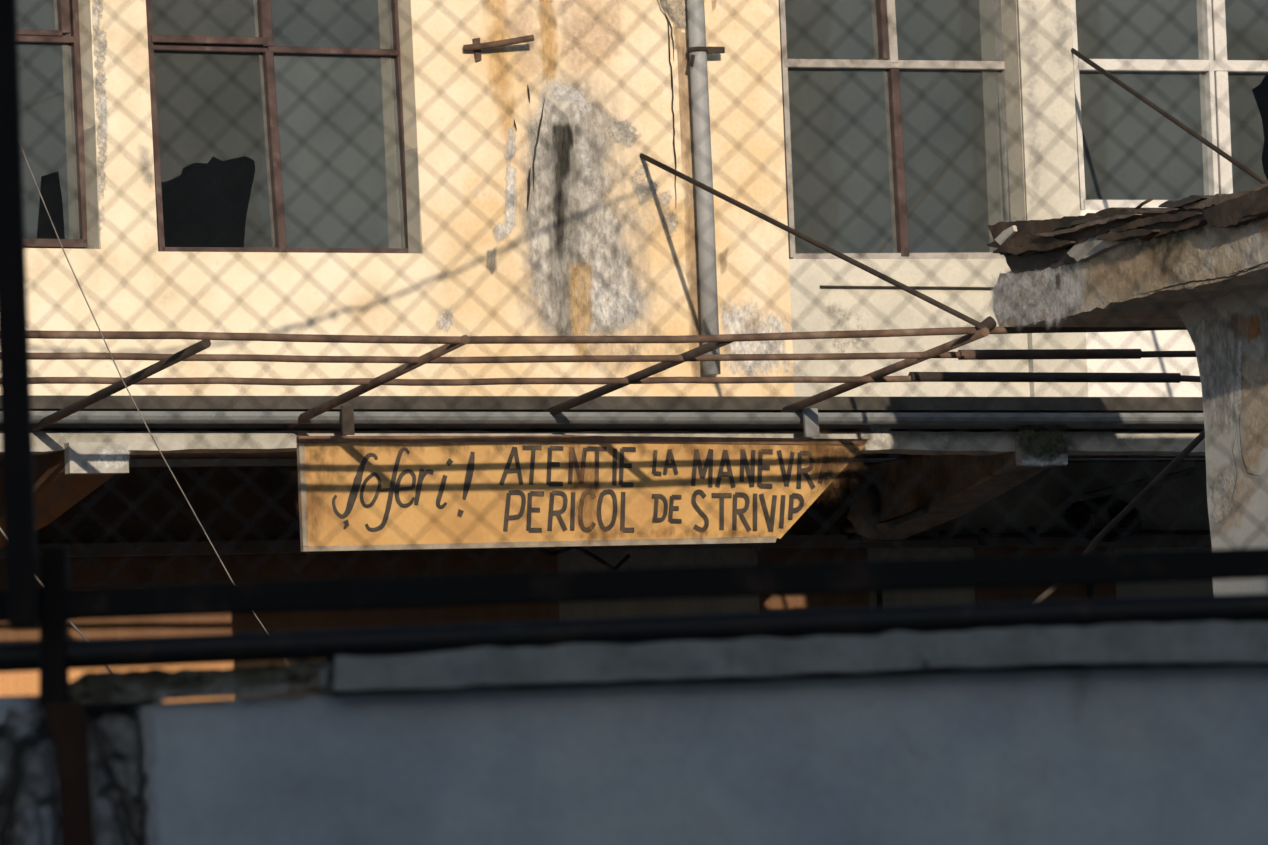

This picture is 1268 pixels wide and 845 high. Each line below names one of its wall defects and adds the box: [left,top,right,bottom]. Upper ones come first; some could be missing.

water stain [487,0,504,84]
flaking render [660,0,688,27]
crack [514,85,545,210]
water stain [524,0,644,336]
peeling [588,104,640,147]
peeling [633,164,678,233]
peeling [995,226,1017,245]
peeling [588,278,641,330]
peeling [990,264,1084,324]
peeling [1193,315,1268,527]
spalling [0,697,61,845]
spalling [89,708,145,845]